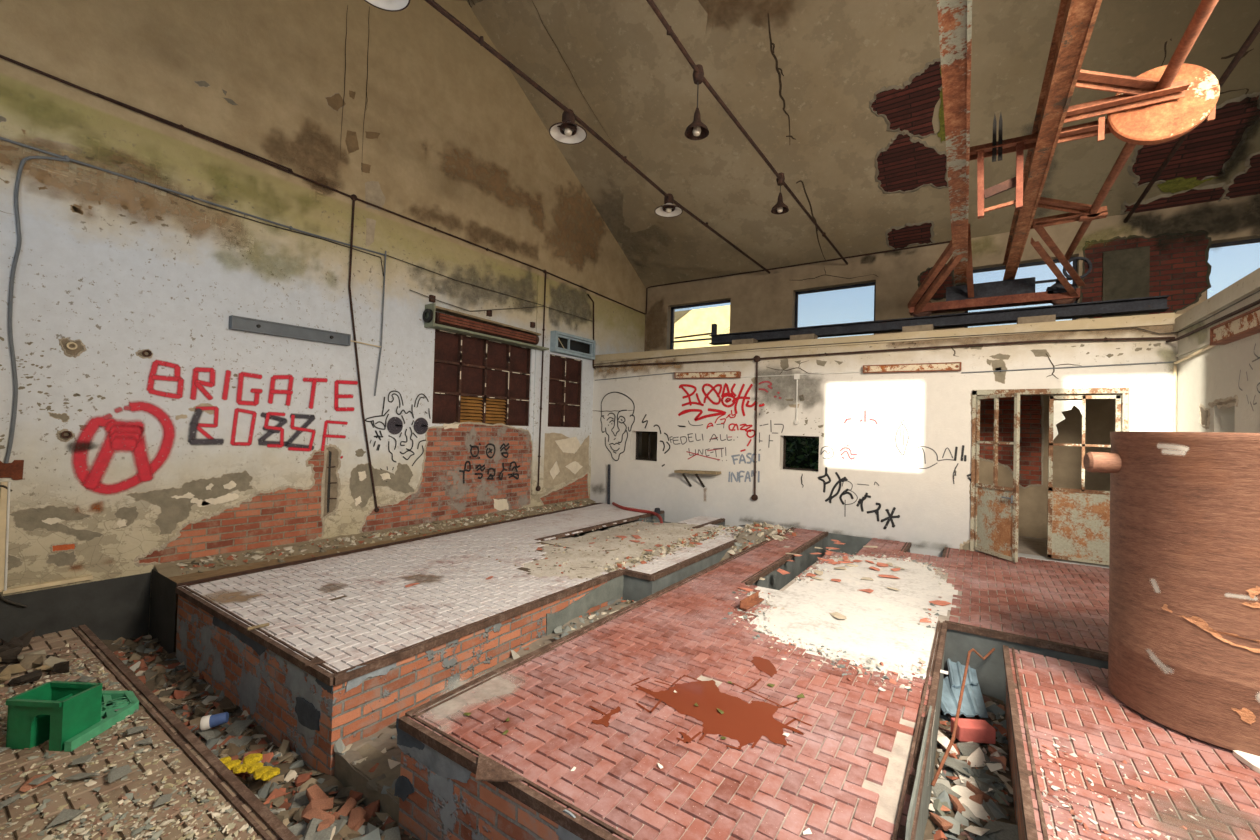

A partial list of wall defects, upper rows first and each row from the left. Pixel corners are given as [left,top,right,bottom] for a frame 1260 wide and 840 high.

leakage [0,141,239,234]
crack [340,6,370,159]
leakage [412,208,536,255]
leakage [443,149,605,269]
crack [767,13,796,141]
spalling [869,58,949,194]
spalling [1120,92,1260,215]
mould [1128,196,1260,249]
leakage [437,269,591,325]
spalling [1199,395,1239,430]
spalling [10,421,590,568]